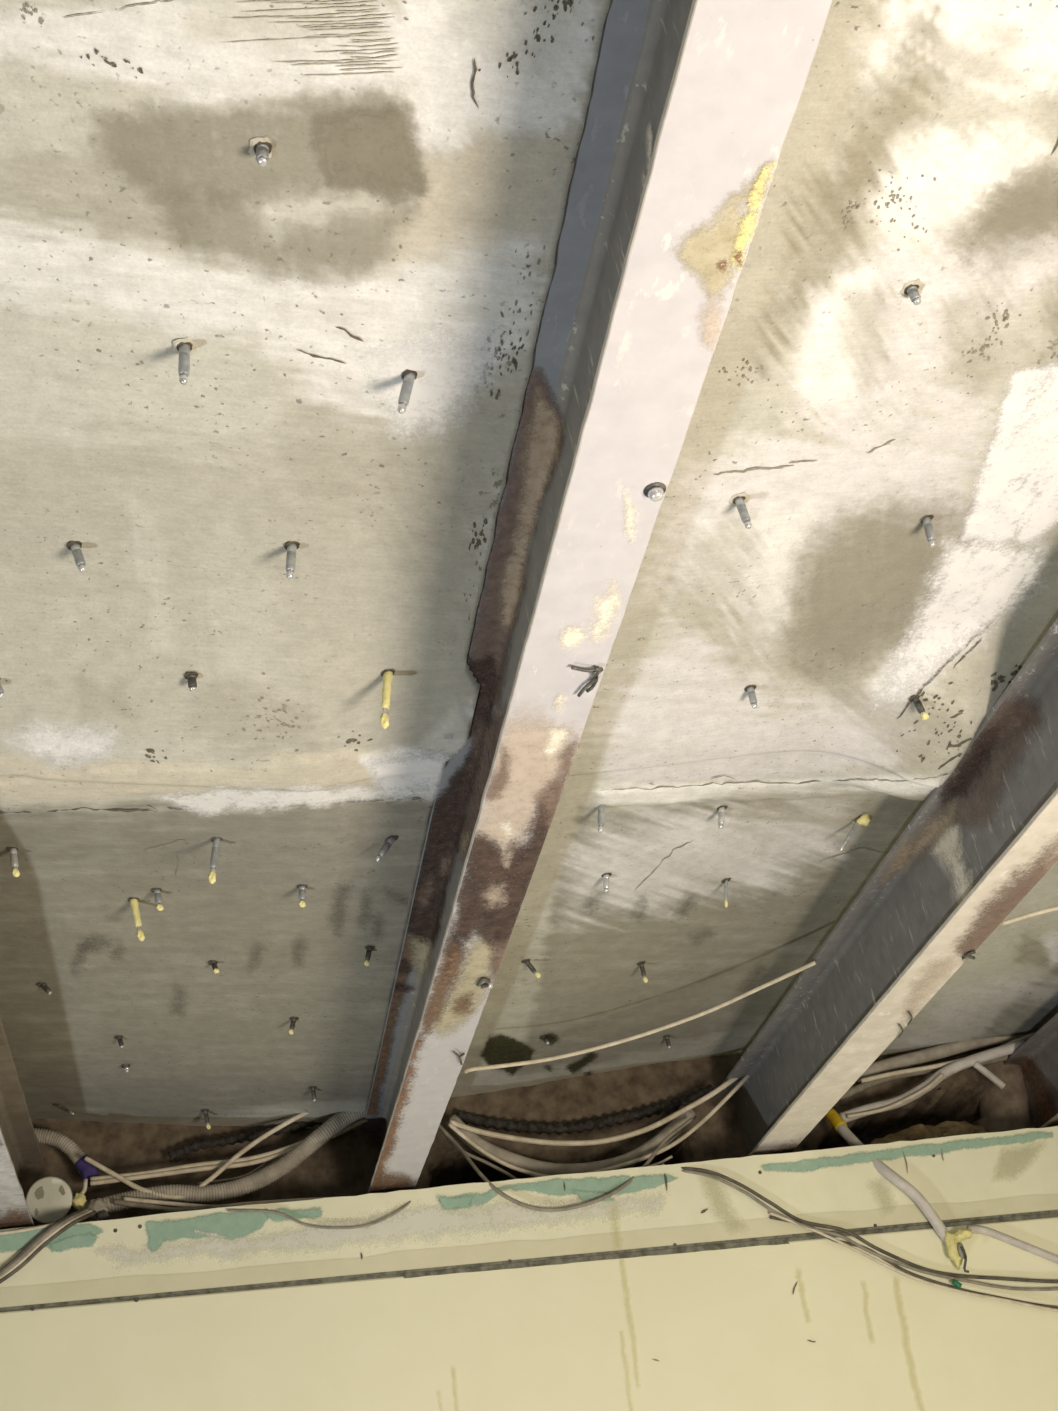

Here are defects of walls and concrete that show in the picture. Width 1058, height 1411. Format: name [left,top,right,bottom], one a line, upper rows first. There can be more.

rust [367,371,578,1193]